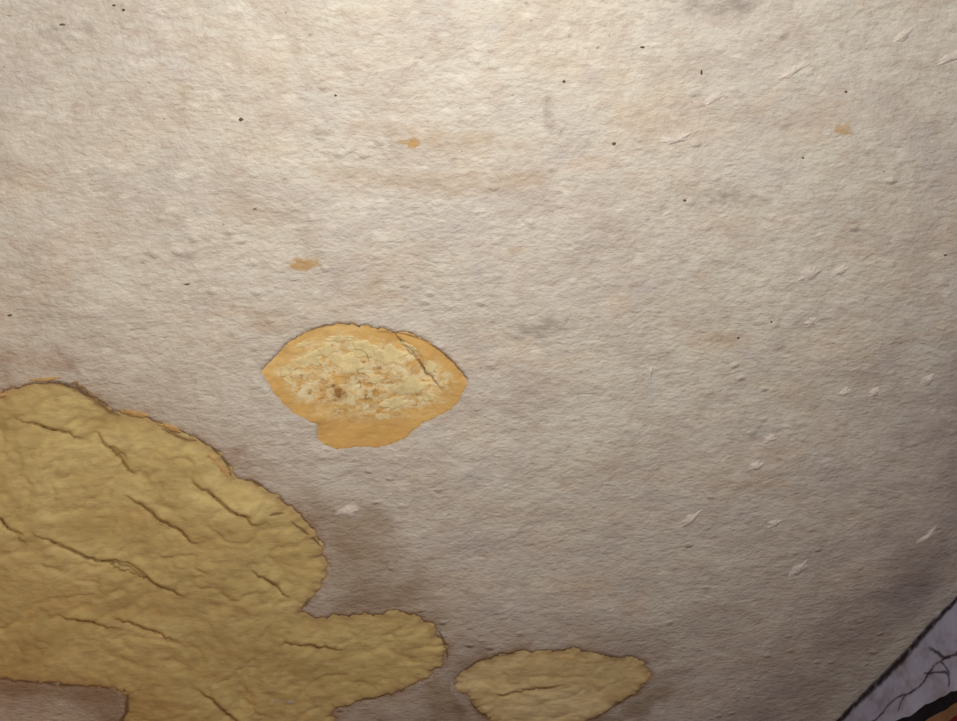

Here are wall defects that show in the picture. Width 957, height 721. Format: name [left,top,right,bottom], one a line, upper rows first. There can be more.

flaking render [262,323,467,450]
flaking render [0,377,448,721]
flaking render [455,647,651,721]